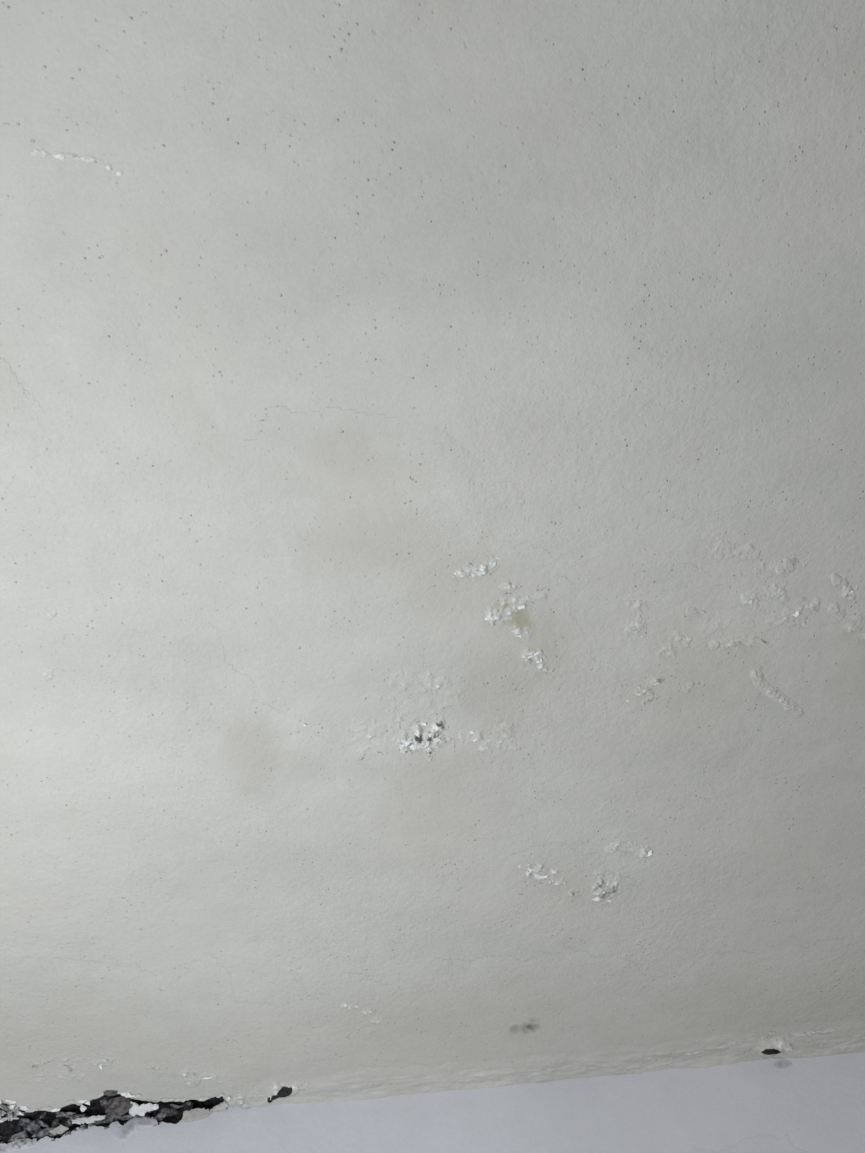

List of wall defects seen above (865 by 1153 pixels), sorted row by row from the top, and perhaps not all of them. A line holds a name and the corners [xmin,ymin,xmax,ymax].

peeling [451,556,555,679]
peeling [391,711,458,761]
peeling [516,860,628,903]
spalling [247,1021,865,1108]
flaking render [0,1090,231,1144]